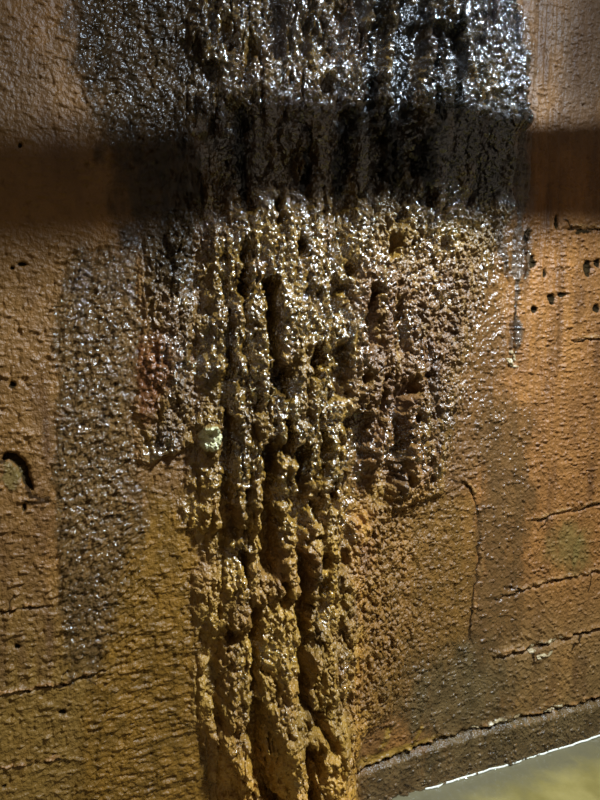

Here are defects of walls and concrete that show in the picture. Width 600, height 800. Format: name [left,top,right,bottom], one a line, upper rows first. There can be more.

leakage [75,0,535,800]
crack [451,478,484,640]
crack [496,567,600,601]
crack [501,625,600,664]
crack [359,695,600,772]